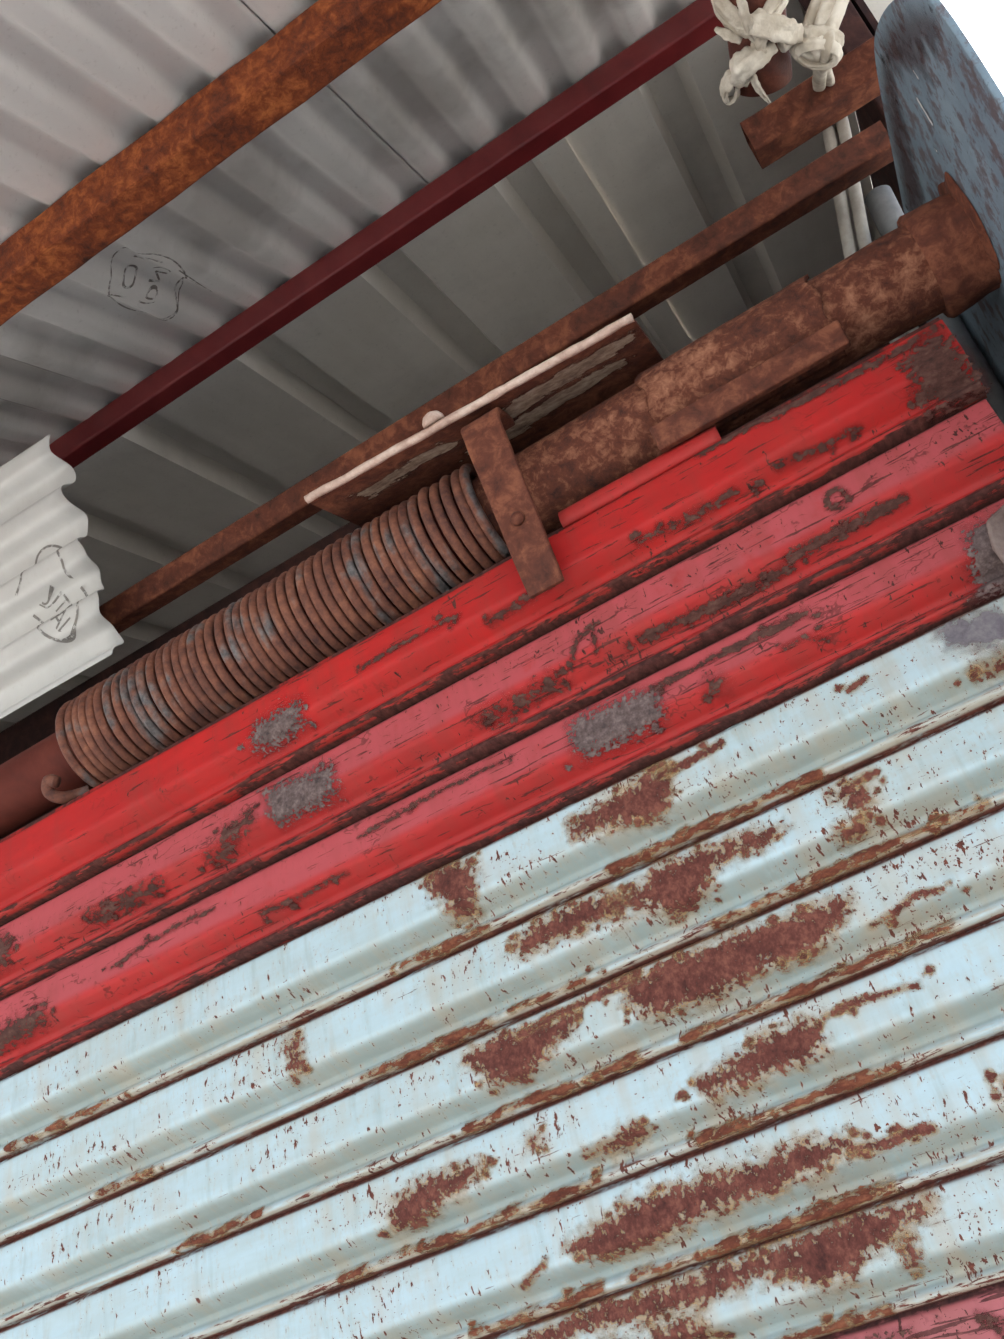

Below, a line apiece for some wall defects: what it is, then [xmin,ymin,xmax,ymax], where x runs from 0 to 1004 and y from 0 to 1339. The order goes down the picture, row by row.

peeling [237,694,317,764]
peeling [563,611,821,771]
peeling [198,758,346,872]
peeling [0,933,19,975]
peeling [81,873,168,926]
rust [360,737,991,1139]
peeling [0,1001,55,1056]
rust [337,1116,659,1285]
rust [467,1061,938,1339]